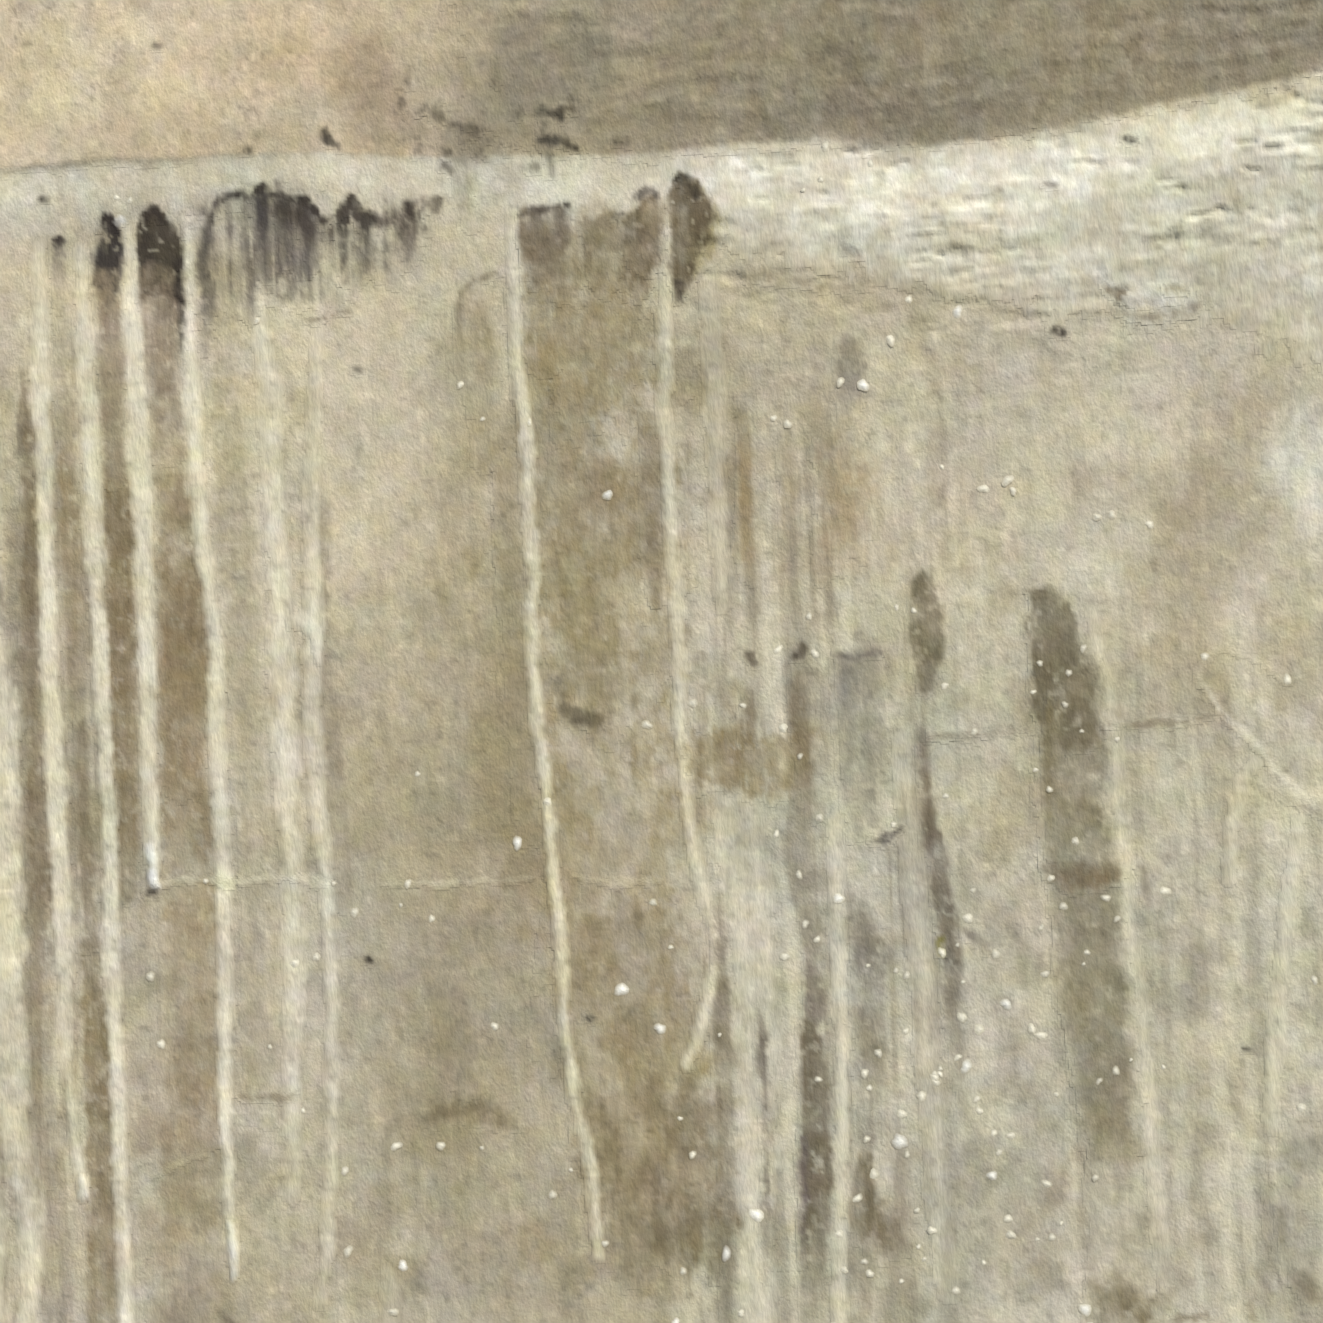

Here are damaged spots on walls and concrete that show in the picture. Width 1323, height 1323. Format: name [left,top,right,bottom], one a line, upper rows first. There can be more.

water stain [0,169,439,1323]
water stain [412,964,529,1136]
water stain [452,167,997,1323]
water stain [1020,579,1178,1323]